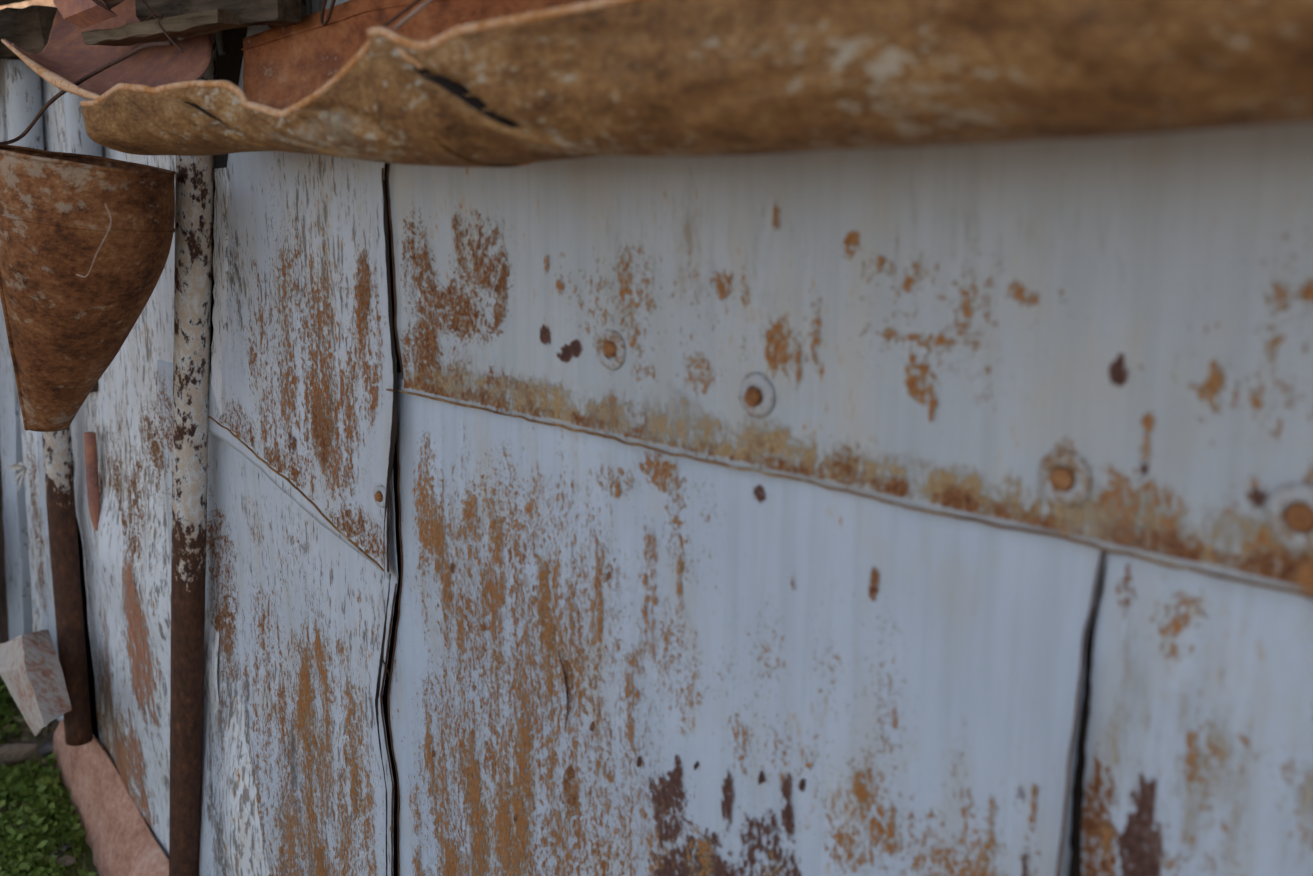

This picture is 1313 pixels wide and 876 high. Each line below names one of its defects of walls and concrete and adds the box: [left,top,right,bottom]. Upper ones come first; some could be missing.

crack [375,180,398,876]
crack [1069,552,1106,876]